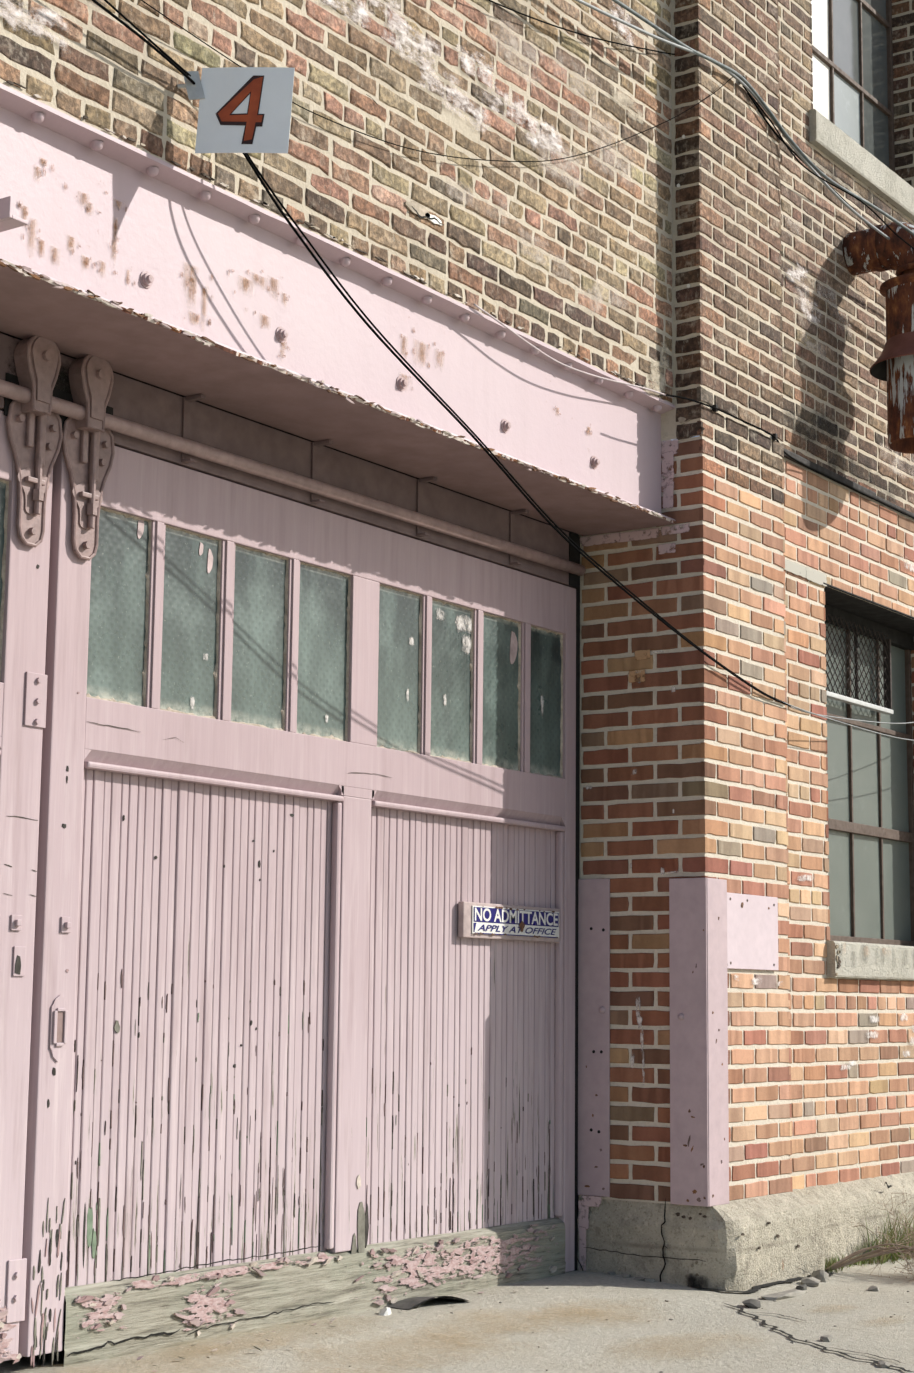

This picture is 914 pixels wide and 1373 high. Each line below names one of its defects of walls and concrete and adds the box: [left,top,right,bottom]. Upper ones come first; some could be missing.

damp [0,0,67,44]
damp [324,0,568,164]
spalling [170,161,229,189]
spalling [284,213,387,262]
spalling [405,201,444,226]
peeling [0,259,216,347]
peeling [241,356,665,518]
peeling [0,977,558,1367]
crack [578,1198,913,1372]